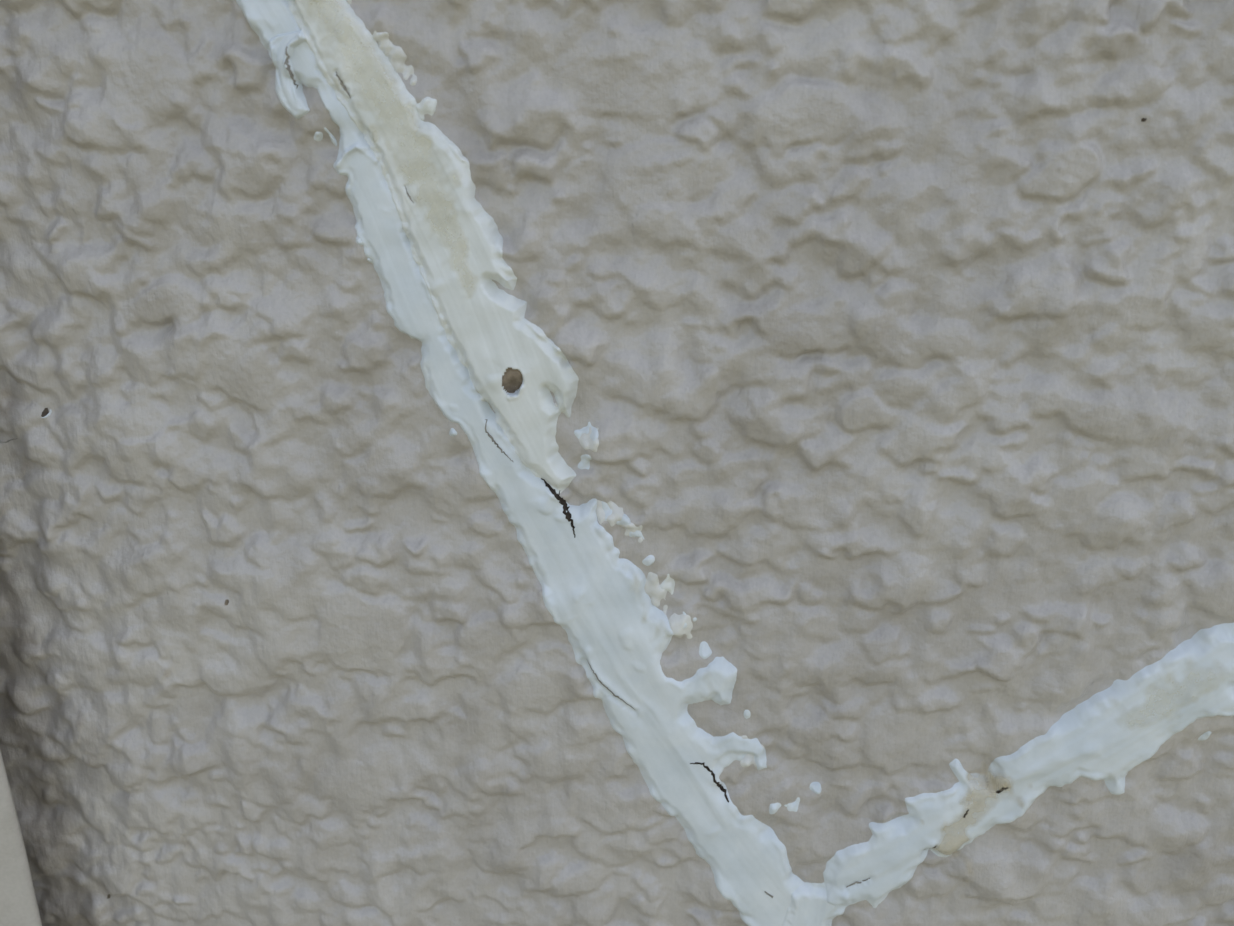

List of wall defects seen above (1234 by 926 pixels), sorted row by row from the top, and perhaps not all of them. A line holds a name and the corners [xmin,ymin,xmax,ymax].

crack [236,0,805,926]
crack [782,623,1234,926]